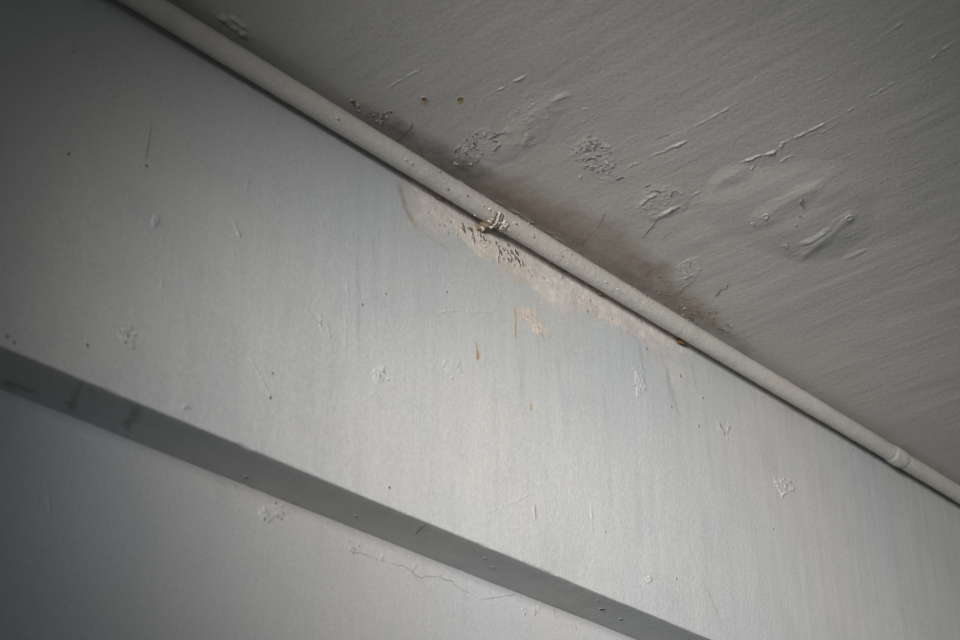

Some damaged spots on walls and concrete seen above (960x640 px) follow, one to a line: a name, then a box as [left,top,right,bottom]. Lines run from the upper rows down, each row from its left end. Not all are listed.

flaking render [569,134,623,185]
flaking render [438,220,545,279]
damp [403,179,693,353]
crack [345,548,518,600]